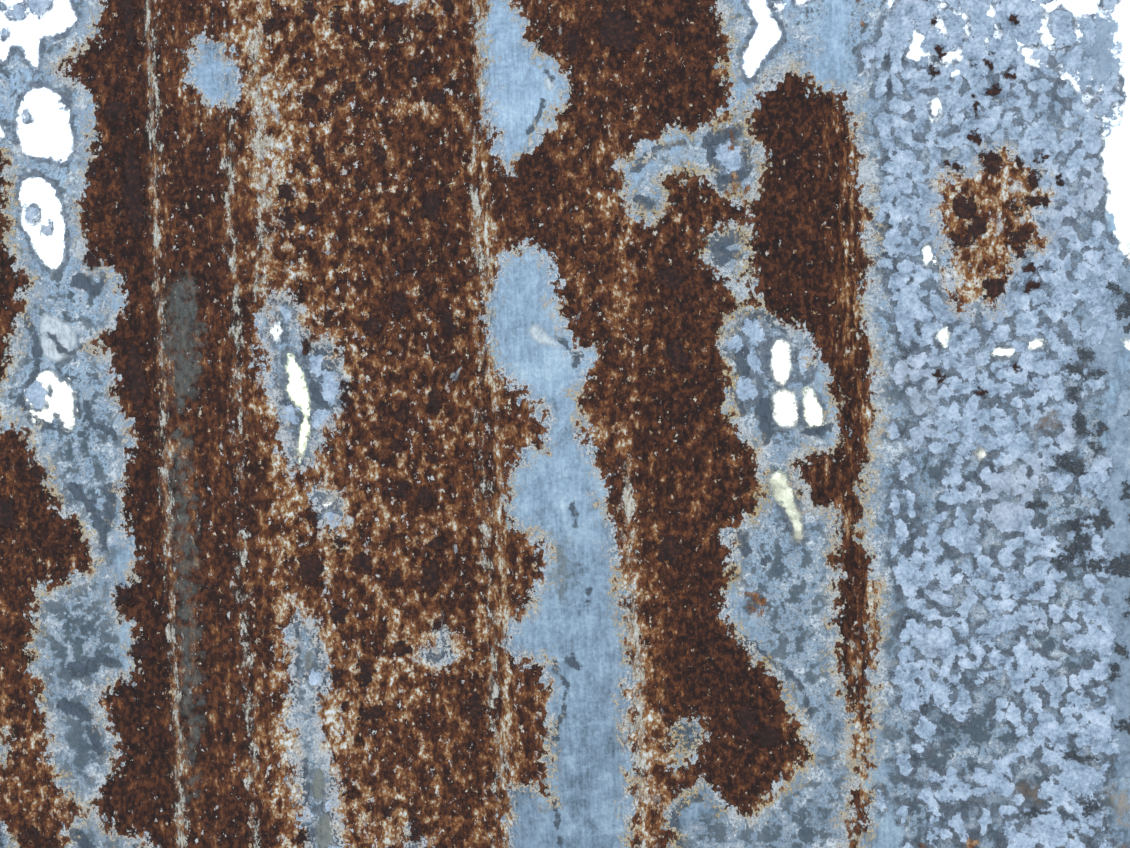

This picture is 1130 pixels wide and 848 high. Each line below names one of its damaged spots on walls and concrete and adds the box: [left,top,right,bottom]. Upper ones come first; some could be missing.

peeling [737,0,812,83]
peeling [0,0,81,275]
peeling [904,0,1130,259]
peeling [921,242,937,269]
peeling [933,328,951,348]
peeling [990,338,1044,362]
spalling [1105,279,1130,350]